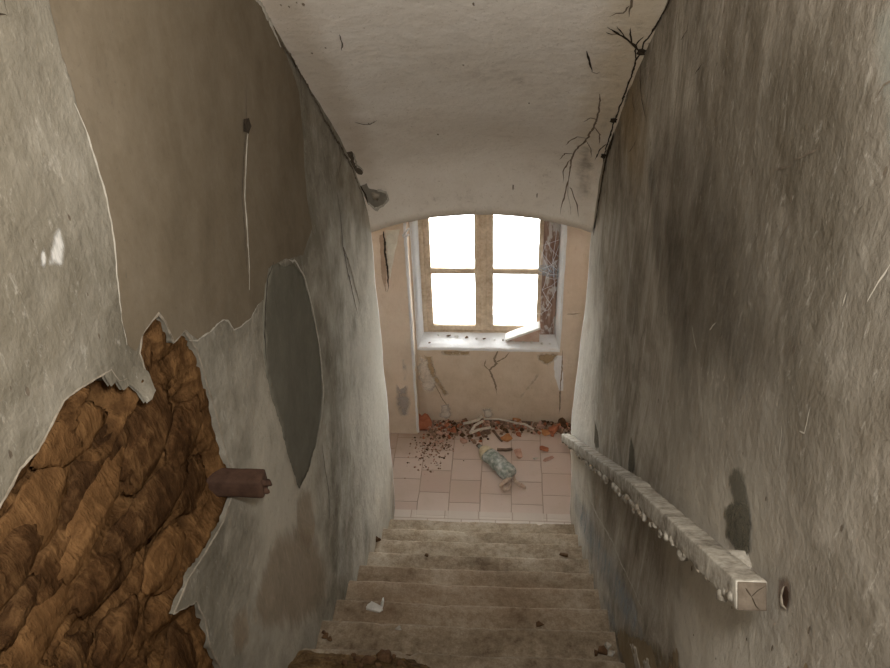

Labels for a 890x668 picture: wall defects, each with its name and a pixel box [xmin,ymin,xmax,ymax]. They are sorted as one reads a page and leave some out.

crack [559,0,670,236]
spalling [347,151,389,211]
peeling [0,0,312,668]
crack [484,351,509,393]
peeling [615,628,679,668]